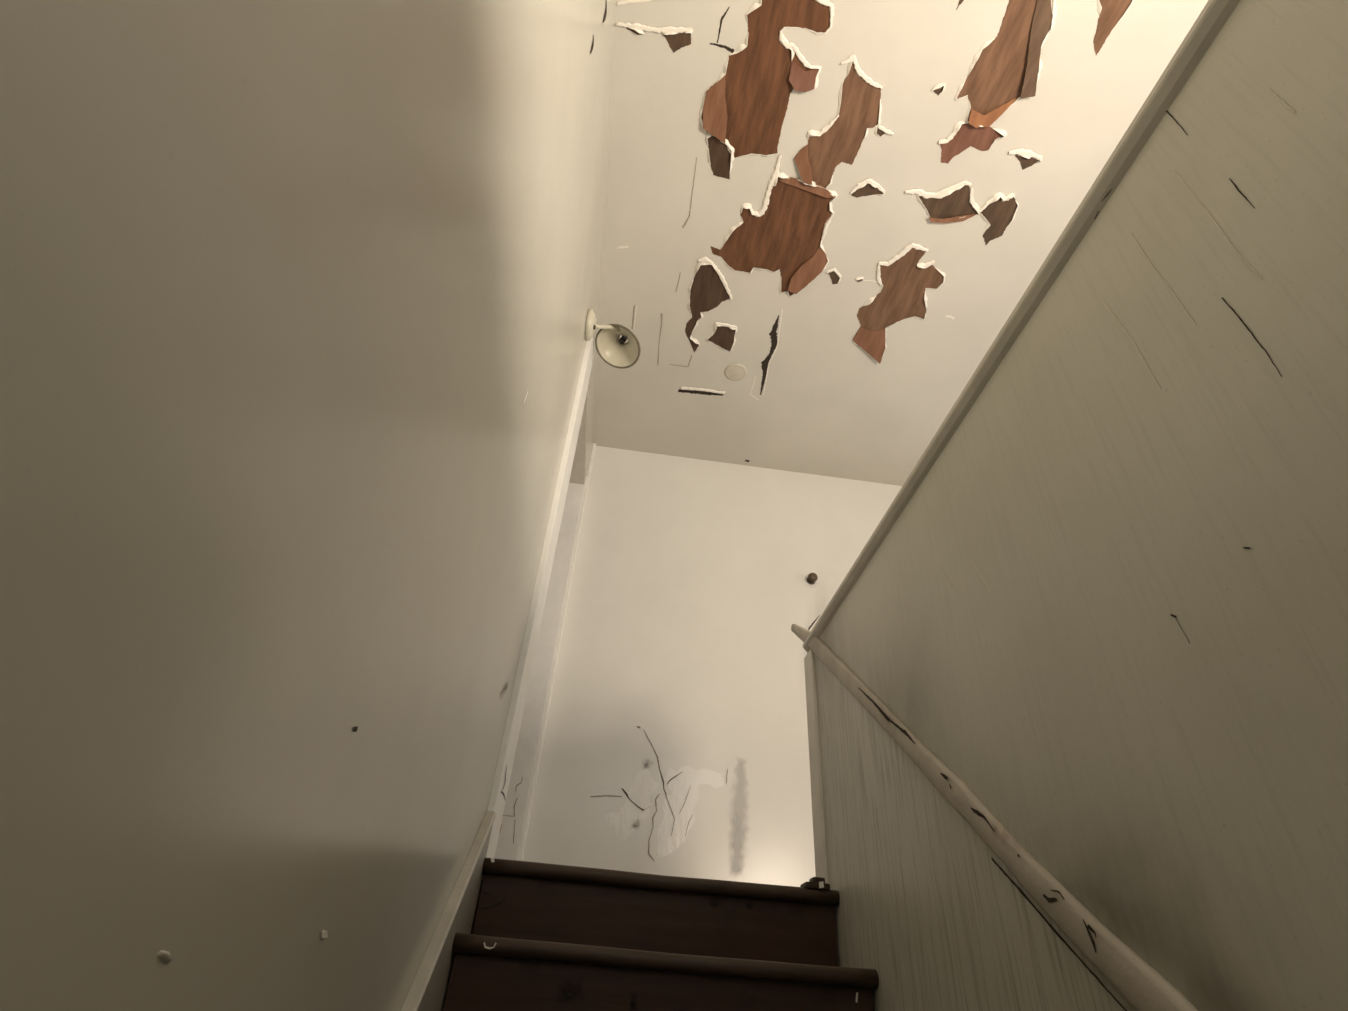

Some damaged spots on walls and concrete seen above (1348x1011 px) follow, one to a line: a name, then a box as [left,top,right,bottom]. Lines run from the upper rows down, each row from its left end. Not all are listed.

peeling [616,22,693,53]
crack [710,7,734,53]
peeling [1093,0,1134,55]
peeling [932,0,1057,170]
peeling [685,0,946,364]
peeling [905,180,1019,245]
crack [590,726,693,861]